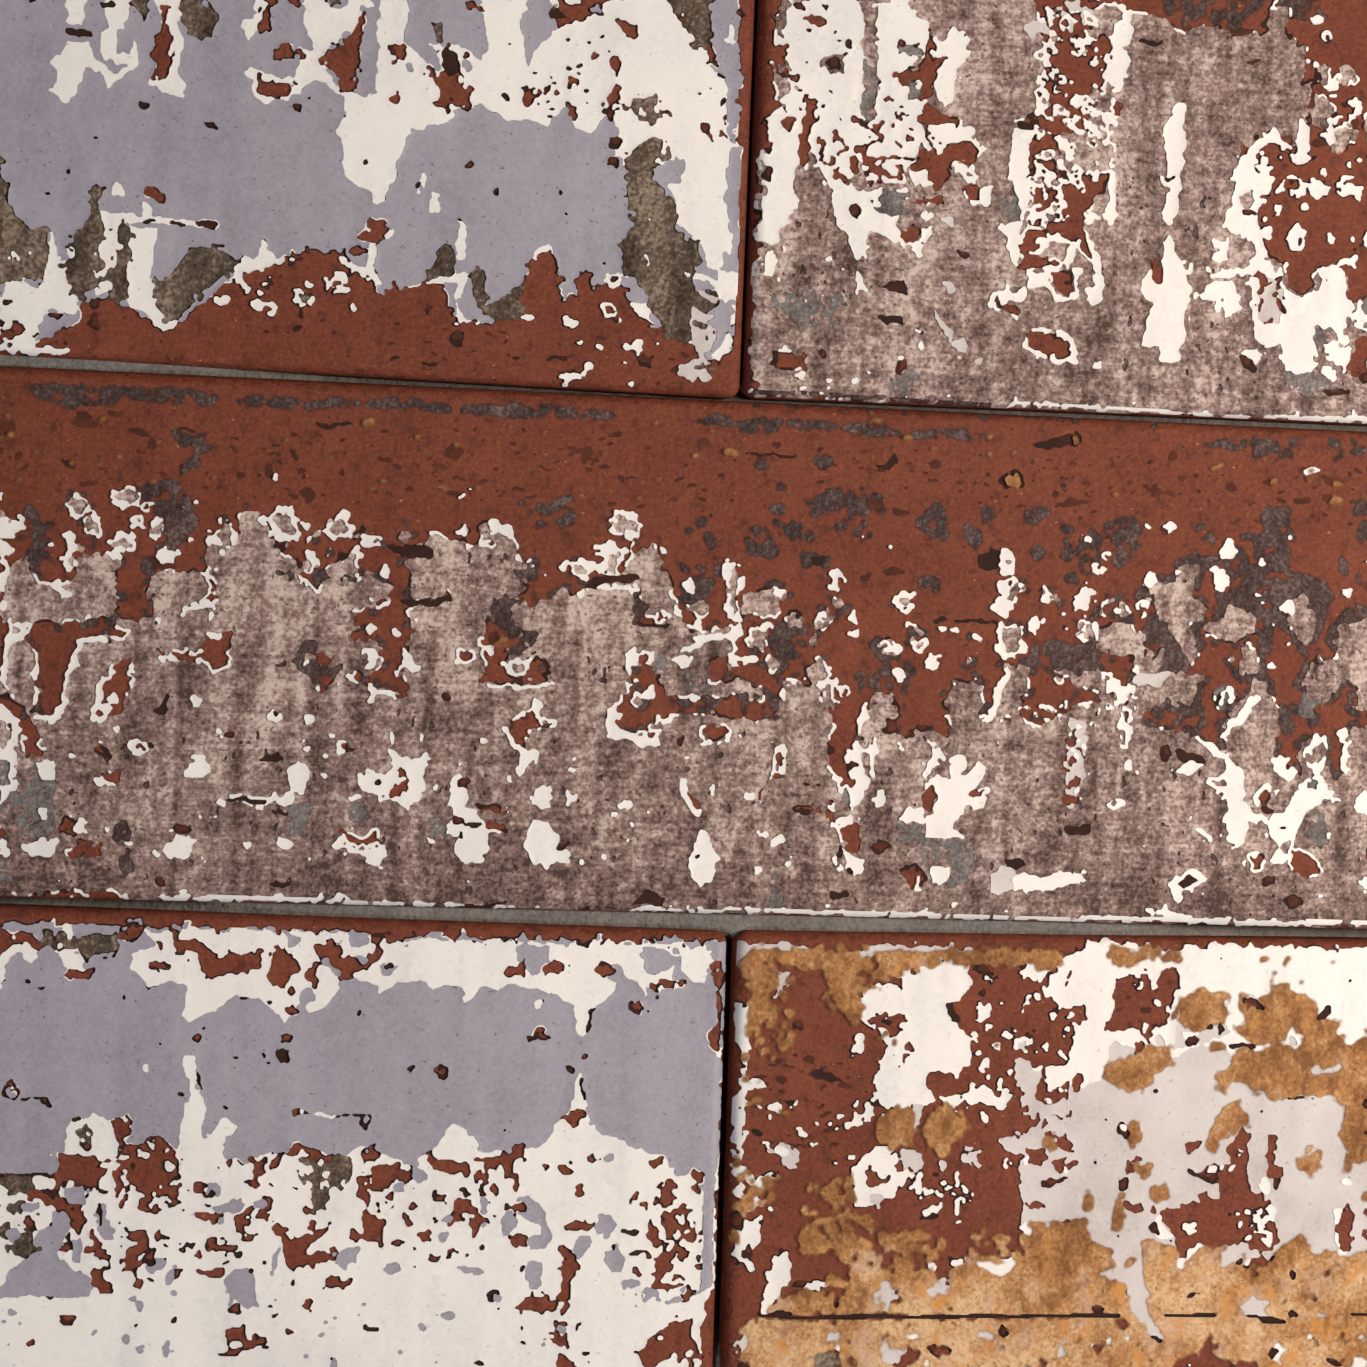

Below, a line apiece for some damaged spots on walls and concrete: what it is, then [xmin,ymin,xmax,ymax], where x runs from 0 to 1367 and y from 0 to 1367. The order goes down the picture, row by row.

peeling [0,0,1367,424]
spalling [316,421,352,430]
spalling [1033,431,1082,450]
spalling [875,453,899,470]
spalling [998,469,1025,489]
peeling [0,485,1367,1367]
crack [756,1311,1121,1321]
crack [1164,1313,1286,1324]
crack [1350,1310,1367,1318]